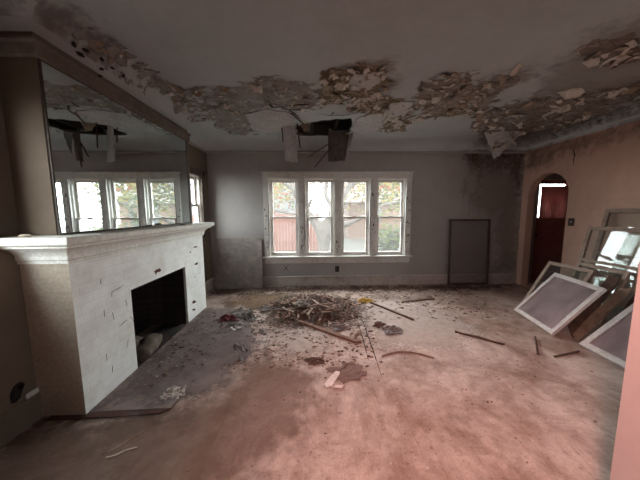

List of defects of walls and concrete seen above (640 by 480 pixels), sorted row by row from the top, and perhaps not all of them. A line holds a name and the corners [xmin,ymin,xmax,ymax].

peeling [71,27,640,167]